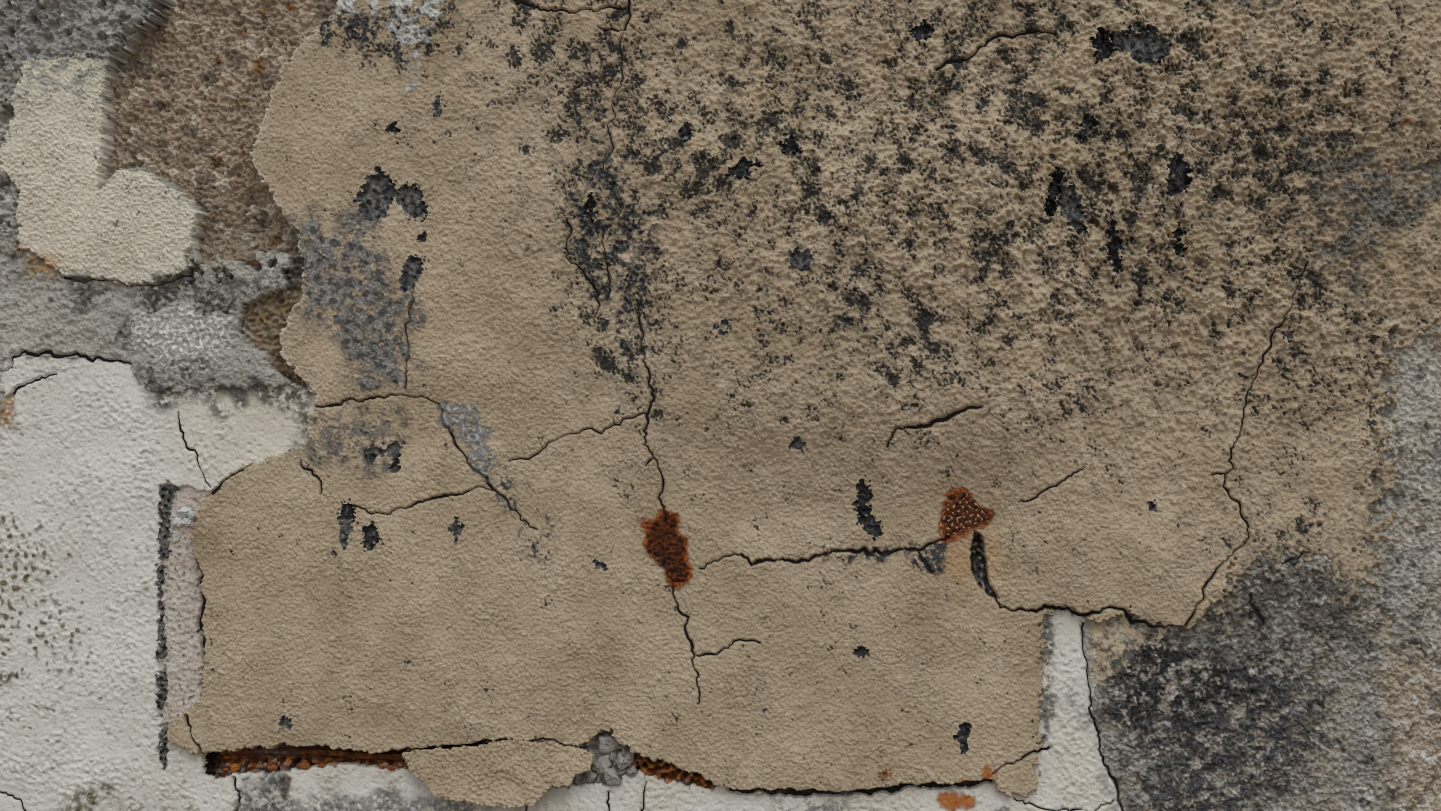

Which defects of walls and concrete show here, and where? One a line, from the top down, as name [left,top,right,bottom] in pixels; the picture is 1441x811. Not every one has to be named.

mould [566,102,655,348]
spalling [1102,211,1126,273]
crack [300,220,666,530]
peeling [0,0,1121,811]
corrosion [641,510,693,589]
crack [672,539,946,704]
corrosion [939,487,994,542]
crack [994,264,1307,811]
leakage [1249,563,1368,633]
corrosion [203,743,412,795]
corrosion [634,756,716,791]
leakage [1105,641,1321,811]